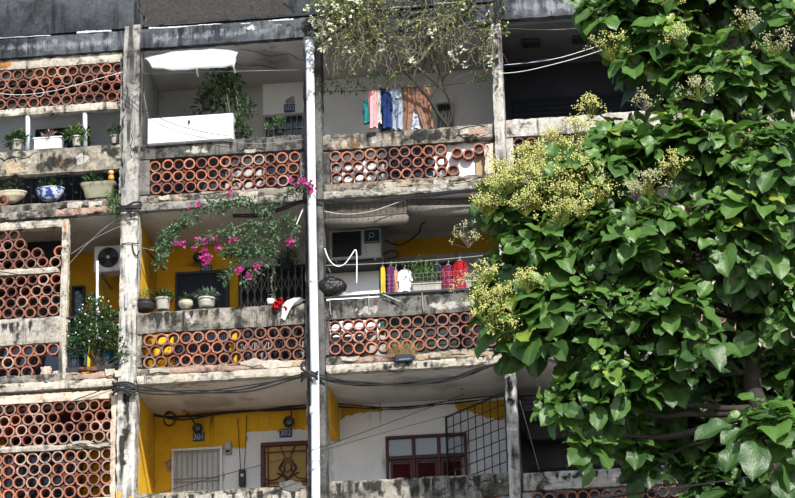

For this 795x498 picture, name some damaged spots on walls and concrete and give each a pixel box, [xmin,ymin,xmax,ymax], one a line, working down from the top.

water stain [516,0,566,14]
crack [121,85,133,158]
water stain [40,151,87,171]
water stain [102,146,122,161]
water stain [119,394,131,476]
water stain [355,481,385,497]
water stain [393,479,434,497]
water stain [449,475,481,489]